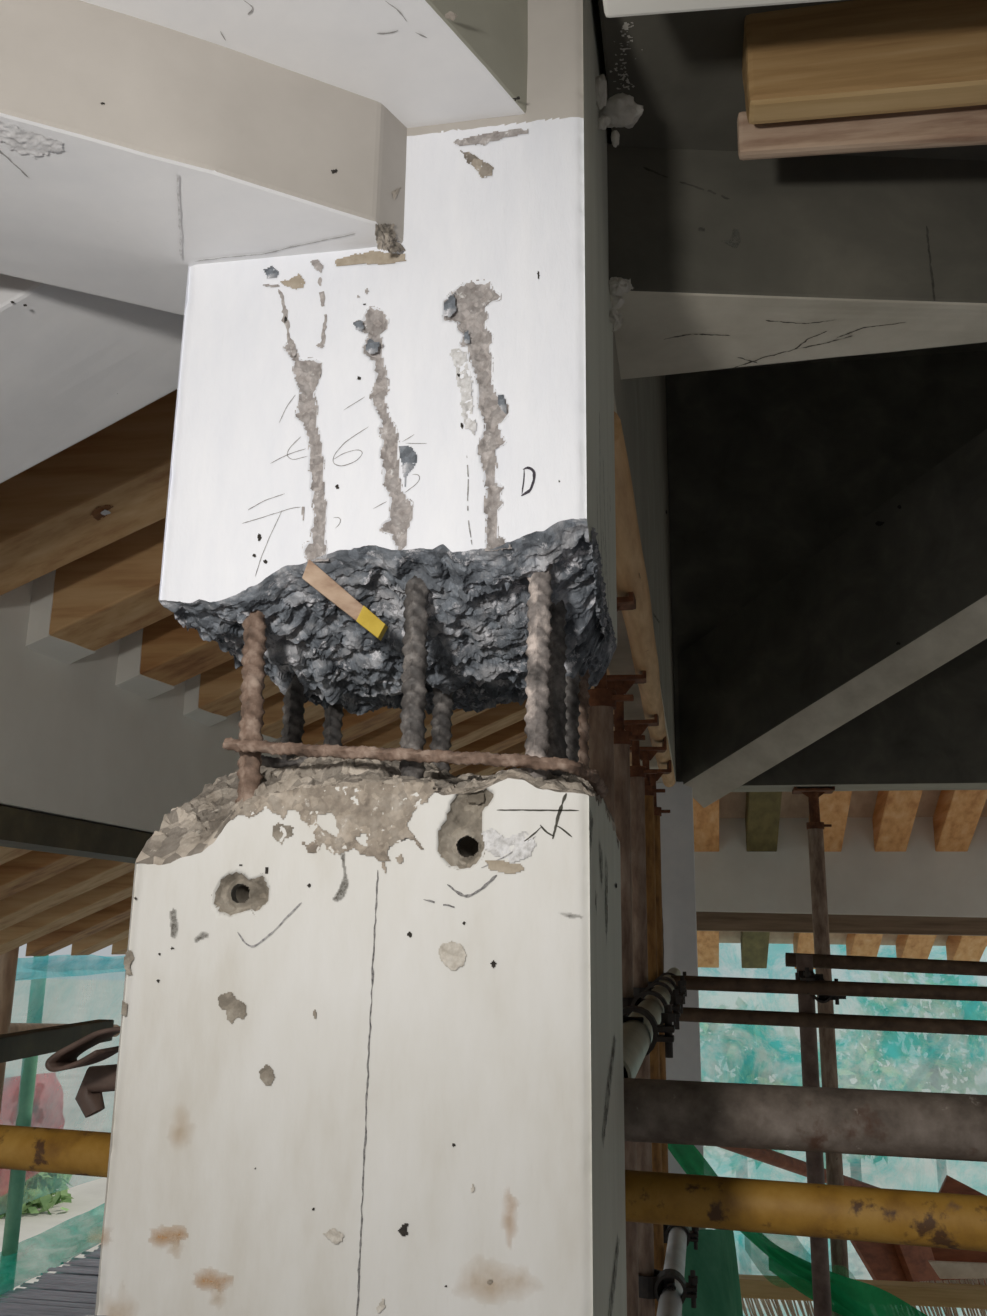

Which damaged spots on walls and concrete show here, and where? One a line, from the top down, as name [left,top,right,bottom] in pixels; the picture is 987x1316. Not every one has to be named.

spalling [263,223,406,290]
crack [667,320,905,370]
crack [465,465,473,544]
spalling [160,518,617,716]
spalling [135,756,620,933]